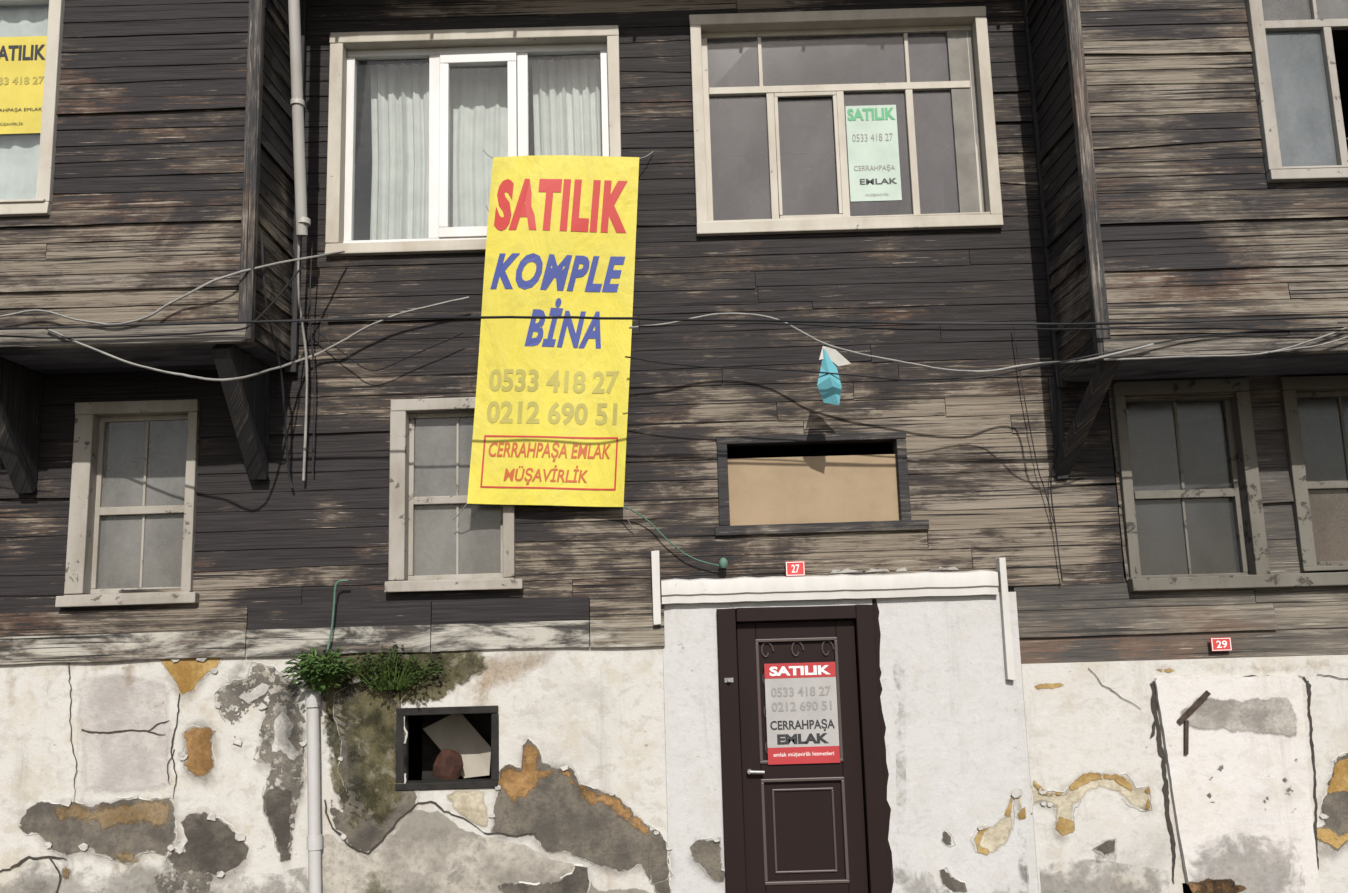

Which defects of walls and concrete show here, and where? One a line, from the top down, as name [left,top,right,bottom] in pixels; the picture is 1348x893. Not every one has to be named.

crack [0,856,66,893]
crack [68,662,180,796]
flaking render [18,795,249,893]
peeling [160,657,307,861]
damp [304,650,498,828]
flaking render [447,738,673,893]
flaking render [690,837,725,883]
flaking render [939,866,968,893]
peeling [940,772,1152,858]
crack [1088,668,1176,883]
flaking render [1182,878,1247,893]
peeling [1314,752,1348,850]